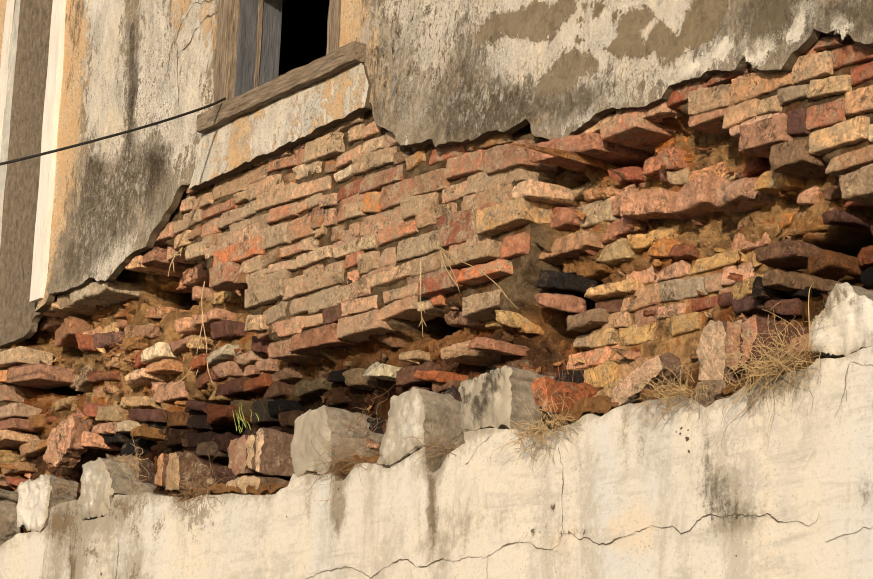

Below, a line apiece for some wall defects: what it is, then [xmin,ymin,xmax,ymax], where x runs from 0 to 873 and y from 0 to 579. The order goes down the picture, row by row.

peeling [474,0,806,100]
peeling [826,0,873,40]
leakage [149,146,168,181]
spalling [503,129,873,352]
spalling [0,247,586,492]
peeling [109,484,148,548]
peeling [168,491,216,539]
leakage [332,485,345,529]
leakage [426,445,440,541]
crack [307,448,819,579]